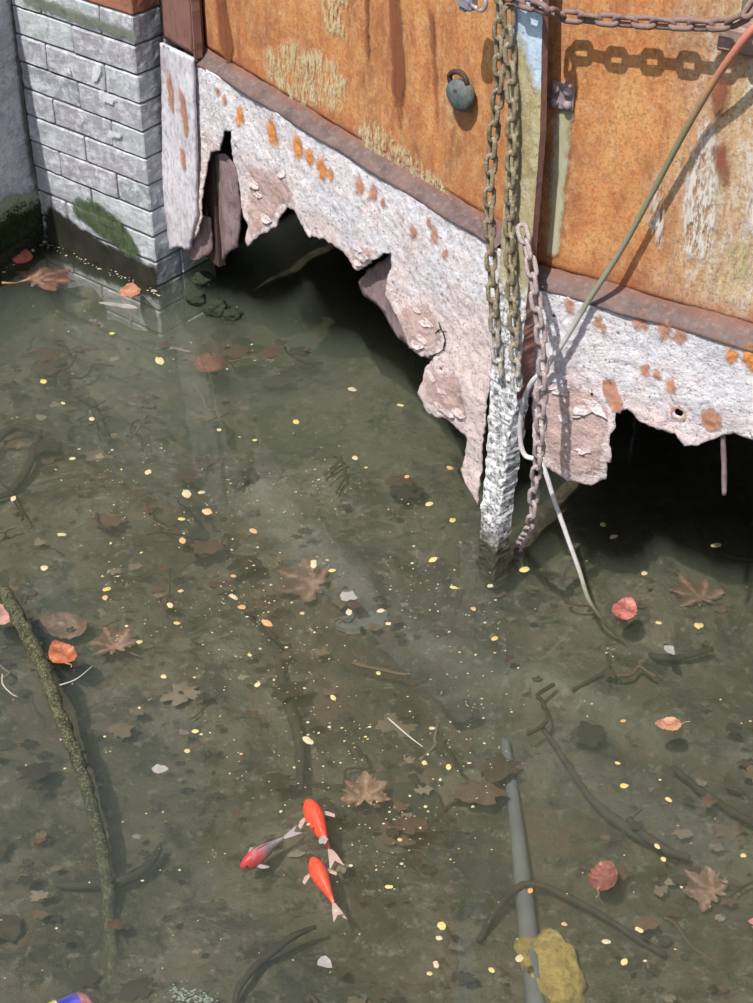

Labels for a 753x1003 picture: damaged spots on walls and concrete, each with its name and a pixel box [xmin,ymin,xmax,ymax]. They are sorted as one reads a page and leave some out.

corrosion [215,0,233,63]
peeling [264,42,346,111]
corrosion [389,0,405,126]
corrosion [266,119,278,145]
corrosion [293,135,333,180]
peeling [358,120,447,194]
corrosion [355,176,385,206]
leakage [0,207,159,300]
peeling [411,307,433,350]
corrosion [726,344,753,371]
peeling [427,370,465,419]
peeling [558,392,607,424]